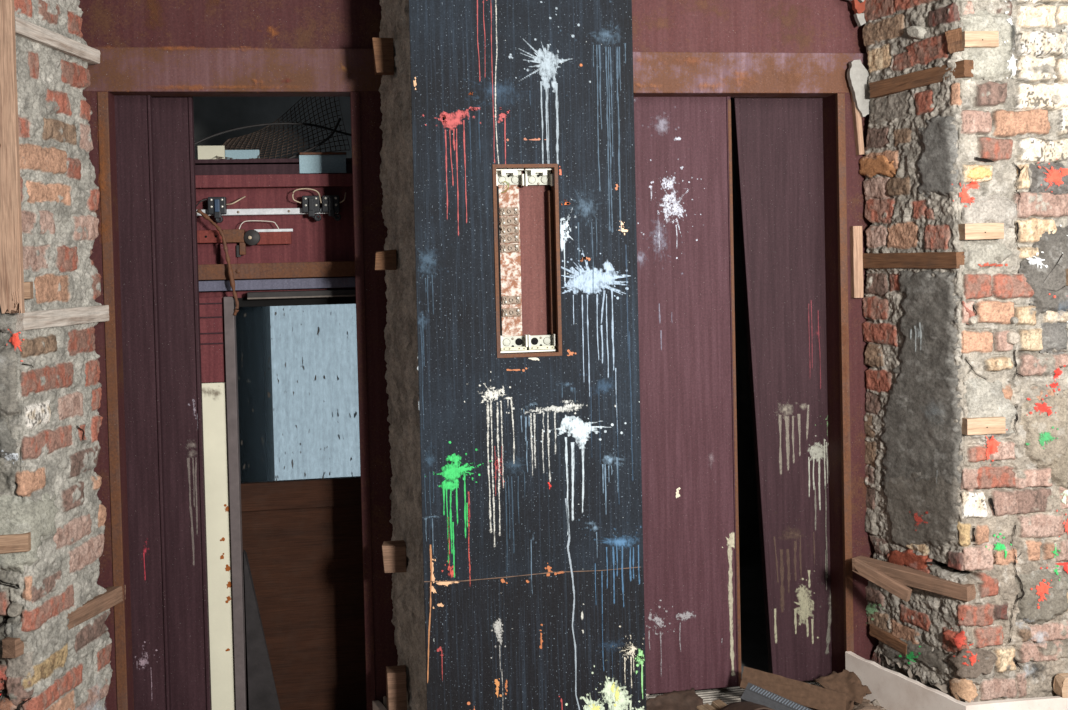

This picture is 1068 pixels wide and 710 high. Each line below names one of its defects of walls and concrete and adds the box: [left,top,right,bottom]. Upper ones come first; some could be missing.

flaking render [850,0,866,27]
flaking render [847,60,870,117]
spalling [859,155,897,178]
spalling [967,164,992,180]
spalling [888,548,933,570]
spalling [943,628,998,703]
spalling [0,671,21,710]